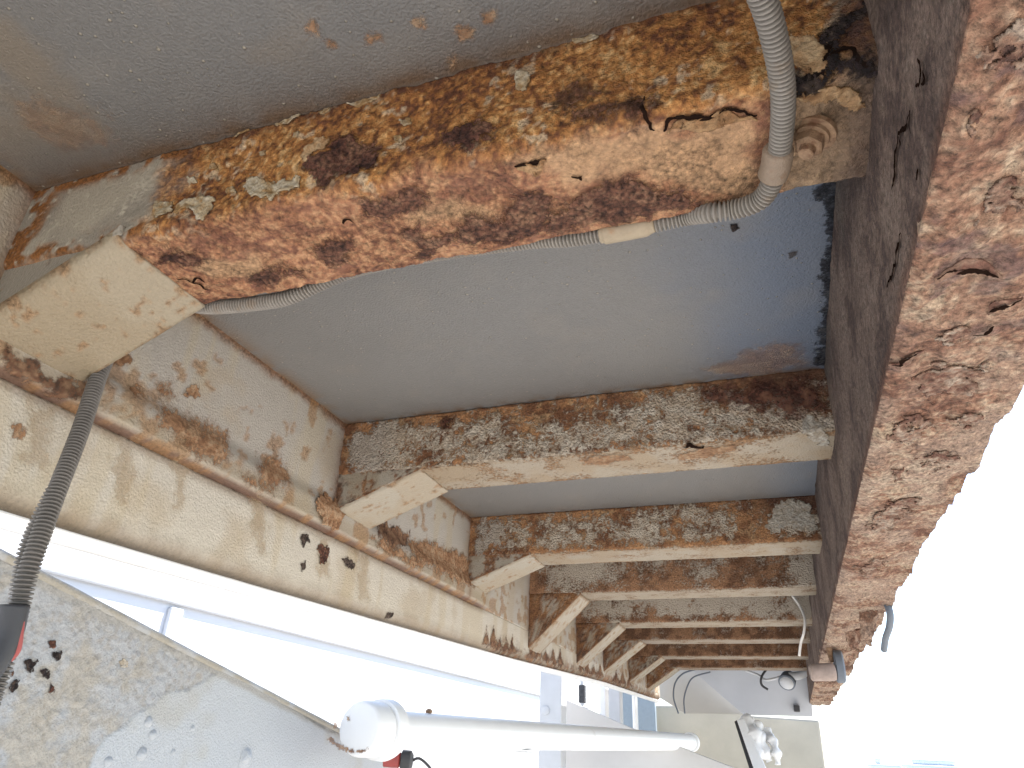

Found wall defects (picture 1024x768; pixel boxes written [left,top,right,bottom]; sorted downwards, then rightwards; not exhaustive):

peeling [789,34,828,74]
rust [795,1,879,97]
crack [639,96,758,134]
peeling [796,85,866,112]
crack [891,58,925,190]
rust [297,133,383,191]
crack [514,158,547,177]
peeling [151,173,301,221]
rust [356,172,705,262]
crack [934,258,1024,336]
rust [1,344,86,400]
peeling [300,534,330,564]